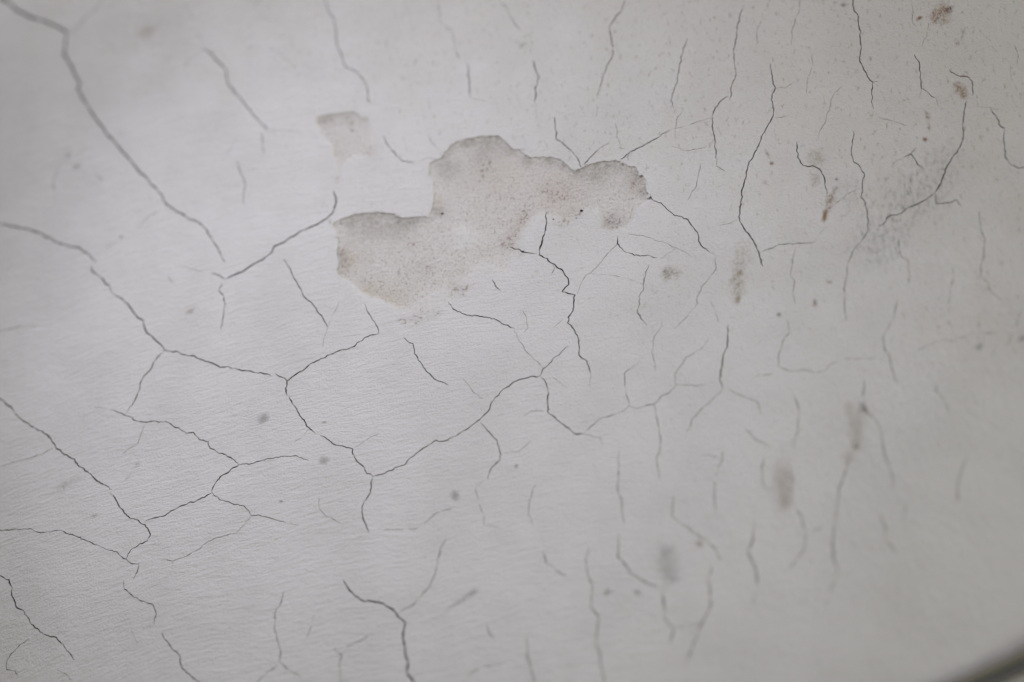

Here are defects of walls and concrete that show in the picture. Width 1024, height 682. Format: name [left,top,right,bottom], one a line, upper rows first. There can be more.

peeling [313,110,383,189]
crack [0,0,770,682]
peeling [331,134,655,331]
crack [724,0,1024,384]